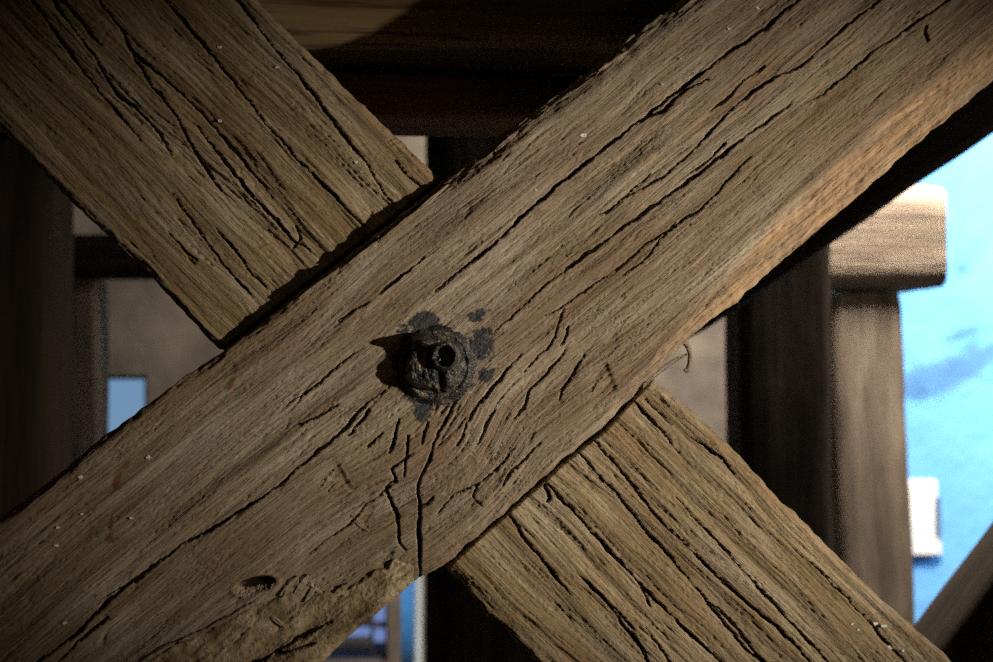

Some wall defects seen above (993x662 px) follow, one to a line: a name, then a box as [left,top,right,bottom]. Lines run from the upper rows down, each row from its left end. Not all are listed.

crack [31,0,316,256]
crack [168,192,267,297]
crack [169,4,386,264]
crack [309,0,879,576]
crack [814,0,950,100]
crack [37,387,389,662]
crack [506,479,721,662]
crack [576,437,828,662]
crack [807,559,904,661]